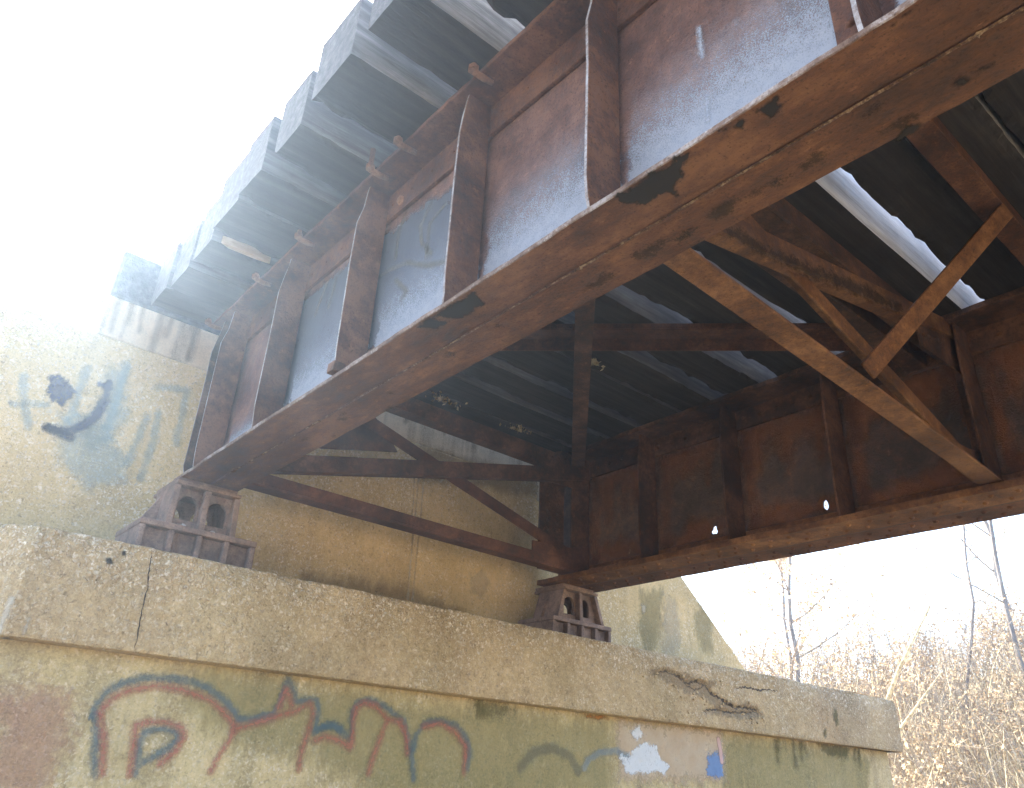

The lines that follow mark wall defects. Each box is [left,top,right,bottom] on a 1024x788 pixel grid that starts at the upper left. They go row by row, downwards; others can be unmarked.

peeling [368,186,452,350]
crack [134,555,152,647]
crack [658,670,777,716]